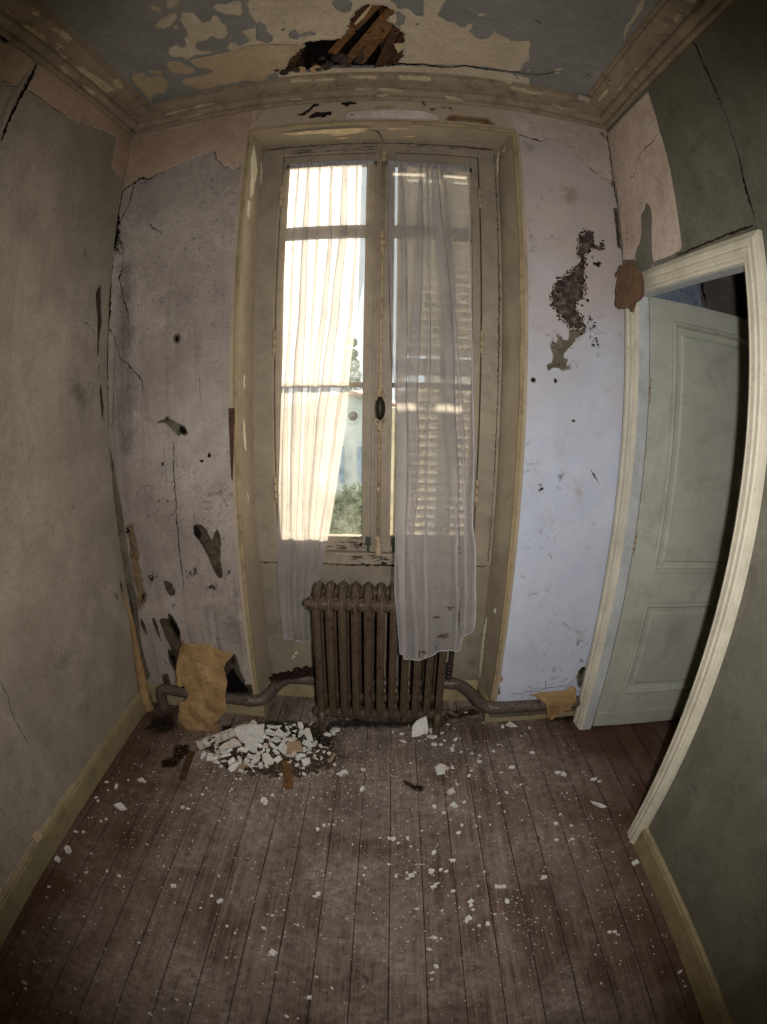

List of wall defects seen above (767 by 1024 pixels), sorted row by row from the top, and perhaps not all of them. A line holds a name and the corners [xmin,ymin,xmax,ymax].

peeling [22,0,542,115]
crack [0,64,86,142]
crack [519,134,657,202]
crack [693,42,756,229]
crack [82,167,172,426]
spalling [546,228,606,383]
spalling [157,416,188,436]
peeling [164,580,176,596]
peeling [193,524,223,579]
peeling [140,612,181,684]